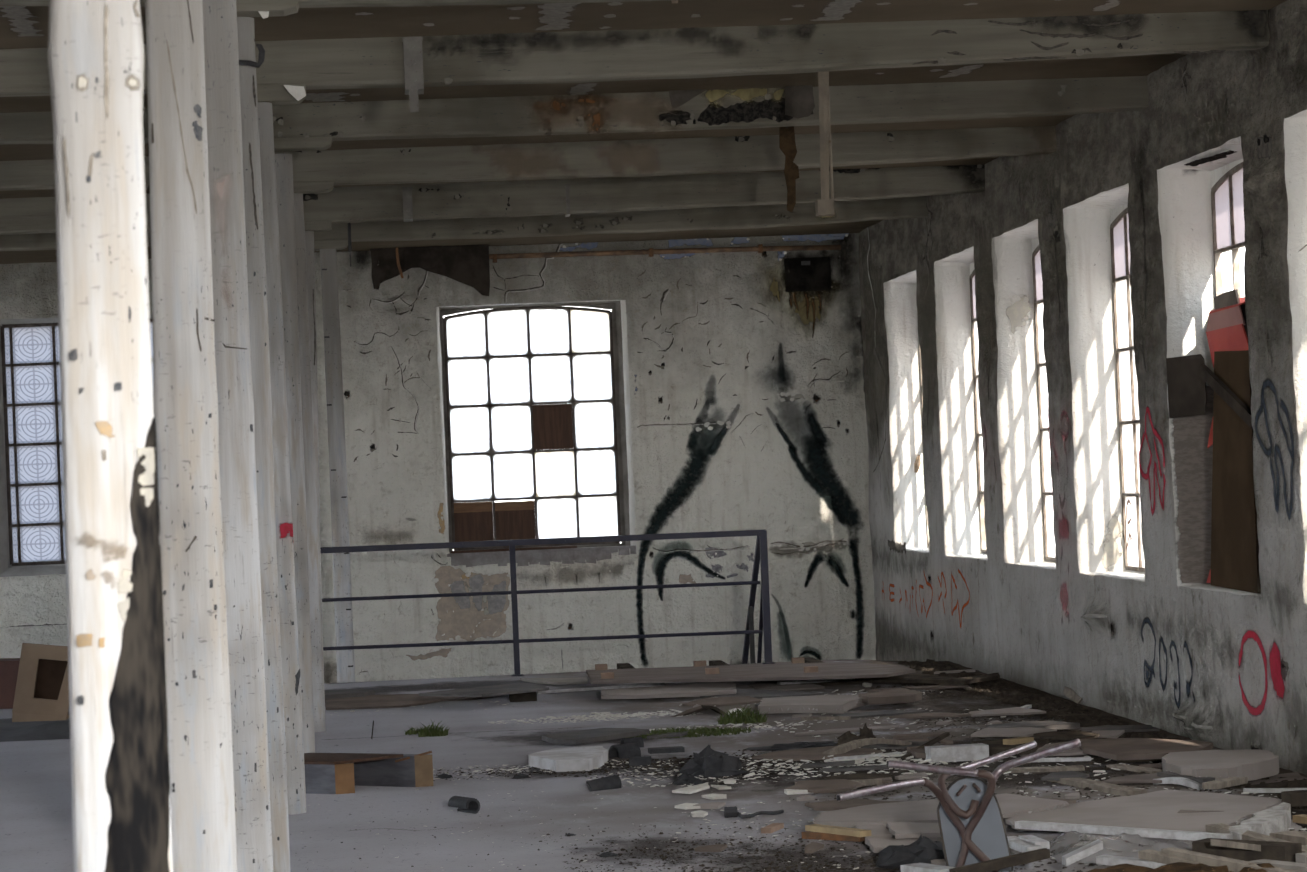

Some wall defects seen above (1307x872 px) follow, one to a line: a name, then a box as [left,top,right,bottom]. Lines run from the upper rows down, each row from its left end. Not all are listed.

leakage [437,32,646,57]
leakage [1025,14,1144,35]
crack [493,244,562,303]
crack [354,271,430,433]
peeling [406,566,510,661]